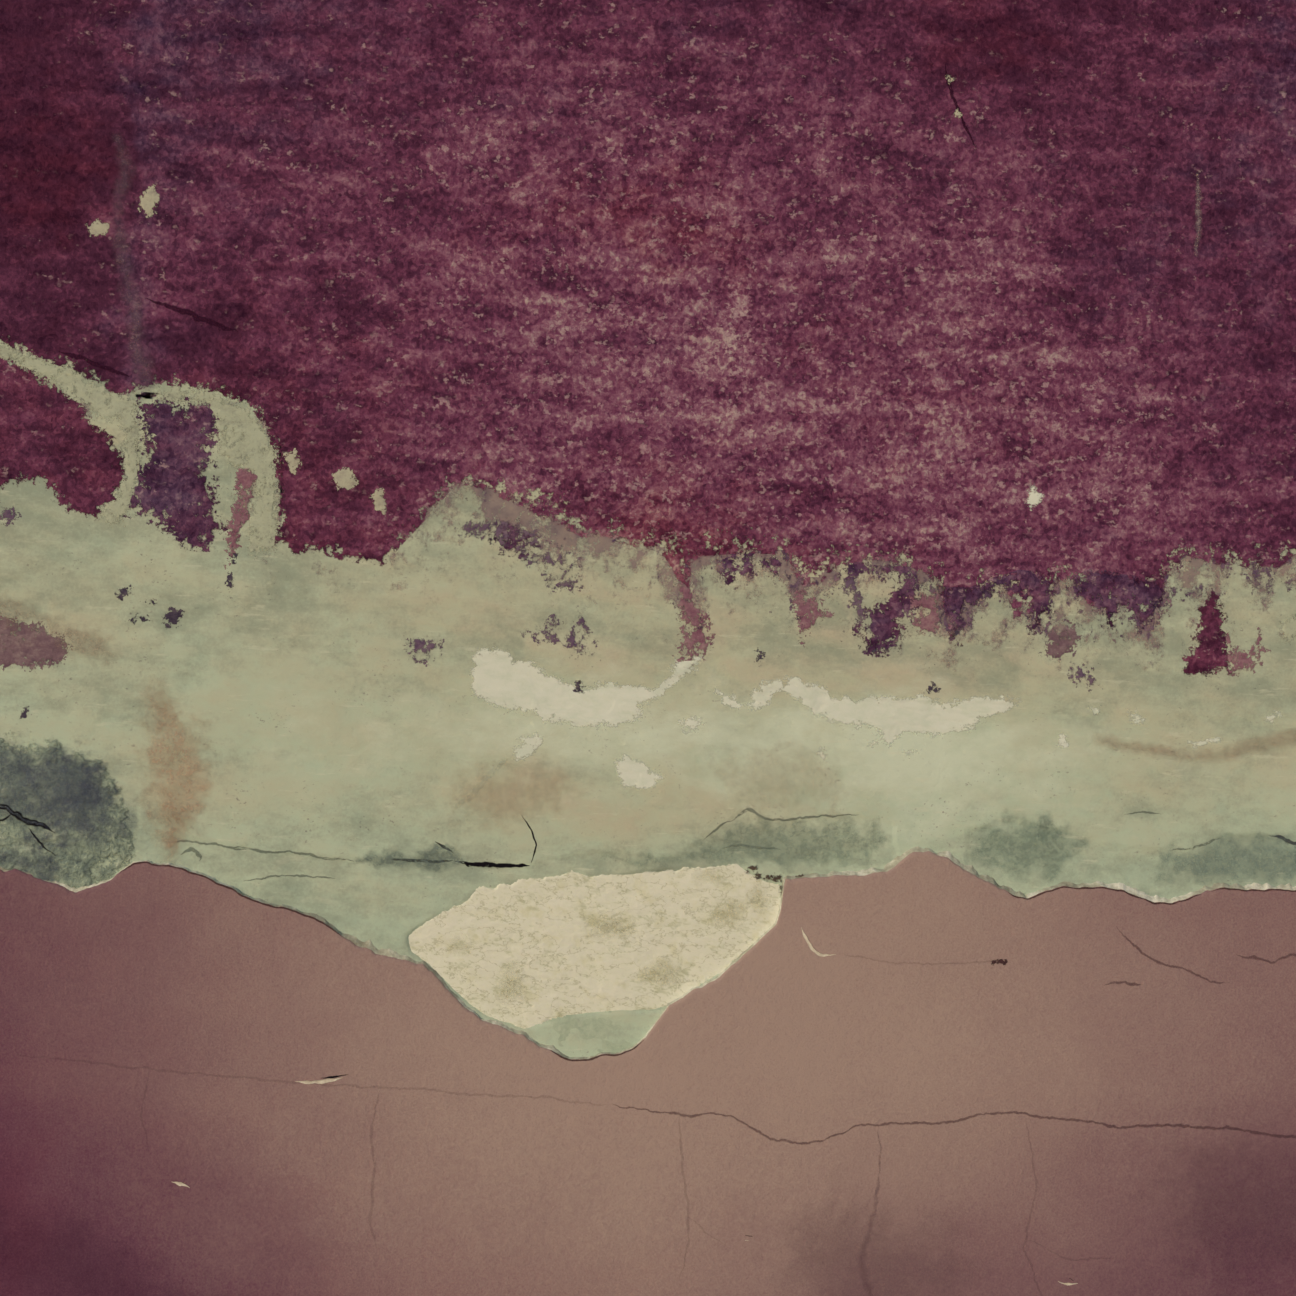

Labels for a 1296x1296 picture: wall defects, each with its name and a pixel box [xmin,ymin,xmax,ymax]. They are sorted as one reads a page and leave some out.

peeling [0,334,1296,1059]
crack [0,804,56,856]
crack [393,816,537,868]
crack [1269,835,1296,845]